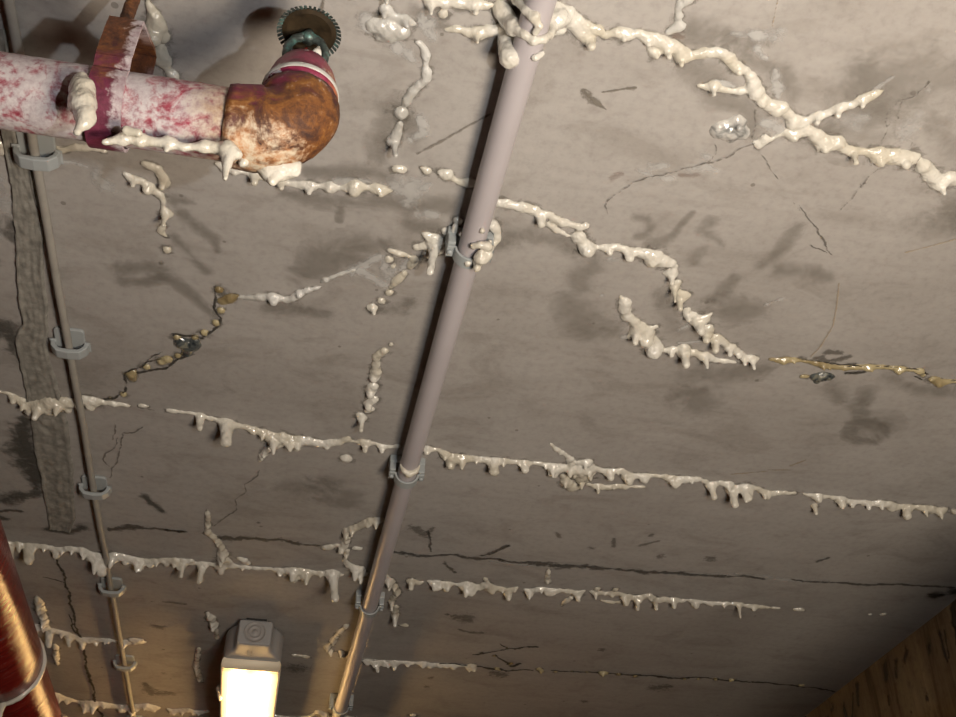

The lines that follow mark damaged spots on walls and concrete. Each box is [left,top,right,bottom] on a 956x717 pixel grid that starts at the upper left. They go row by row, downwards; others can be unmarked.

leakage [56,0,956,205]
leakage [496,197,956,388]
crack [103,286,222,477]
leakage [165,342,402,463]
crack [813,360,928,380]
crack [45,559,104,717]
crack [108,524,187,533]
leakage [8,509,385,603]
crack [216,476,319,546]
crack [394,531,765,580]
leakage [384,569,781,628]
leakage [423,443,956,520]